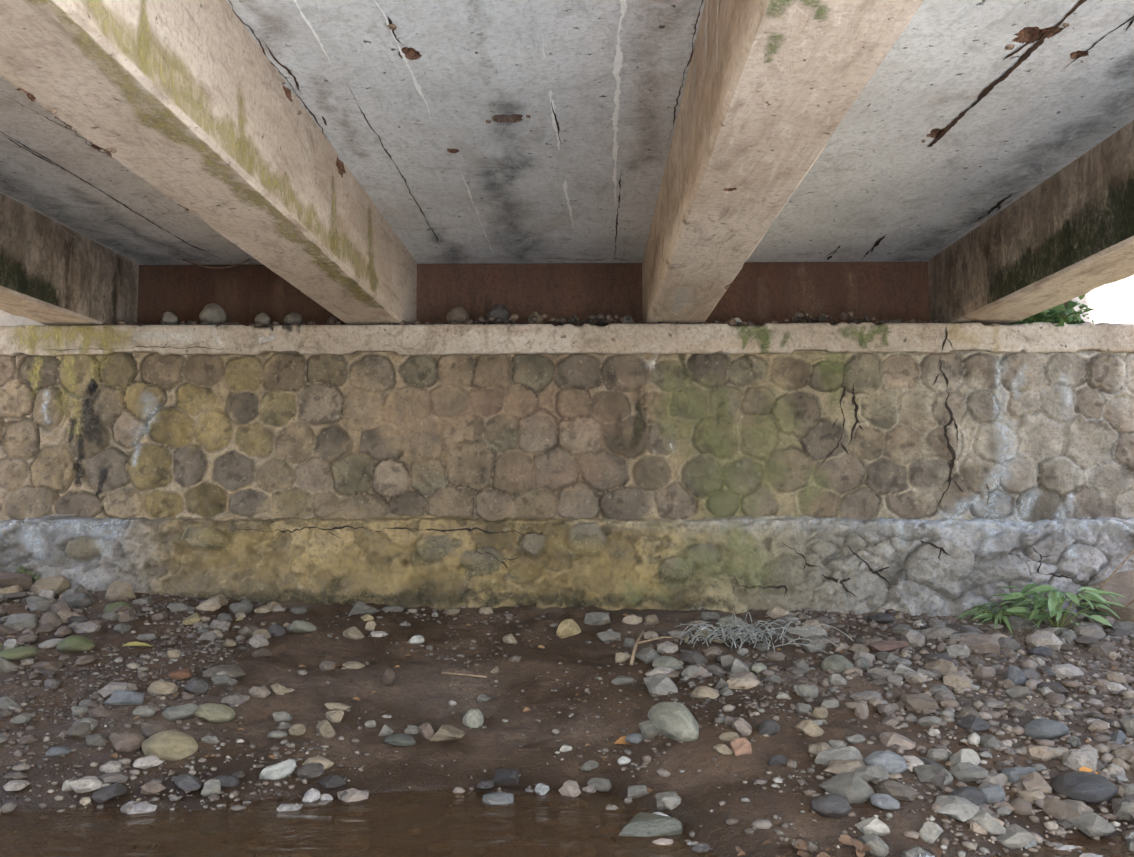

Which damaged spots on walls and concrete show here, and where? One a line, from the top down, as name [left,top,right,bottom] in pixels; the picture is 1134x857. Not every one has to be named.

damp [139,0,149,72]
crack [1,94,114,158]
crack [293,0,444,249]
crack [0,131,216,258]
damp [312,181,375,301]
damp [1120,175,1134,241]
crack [816,357,863,470]